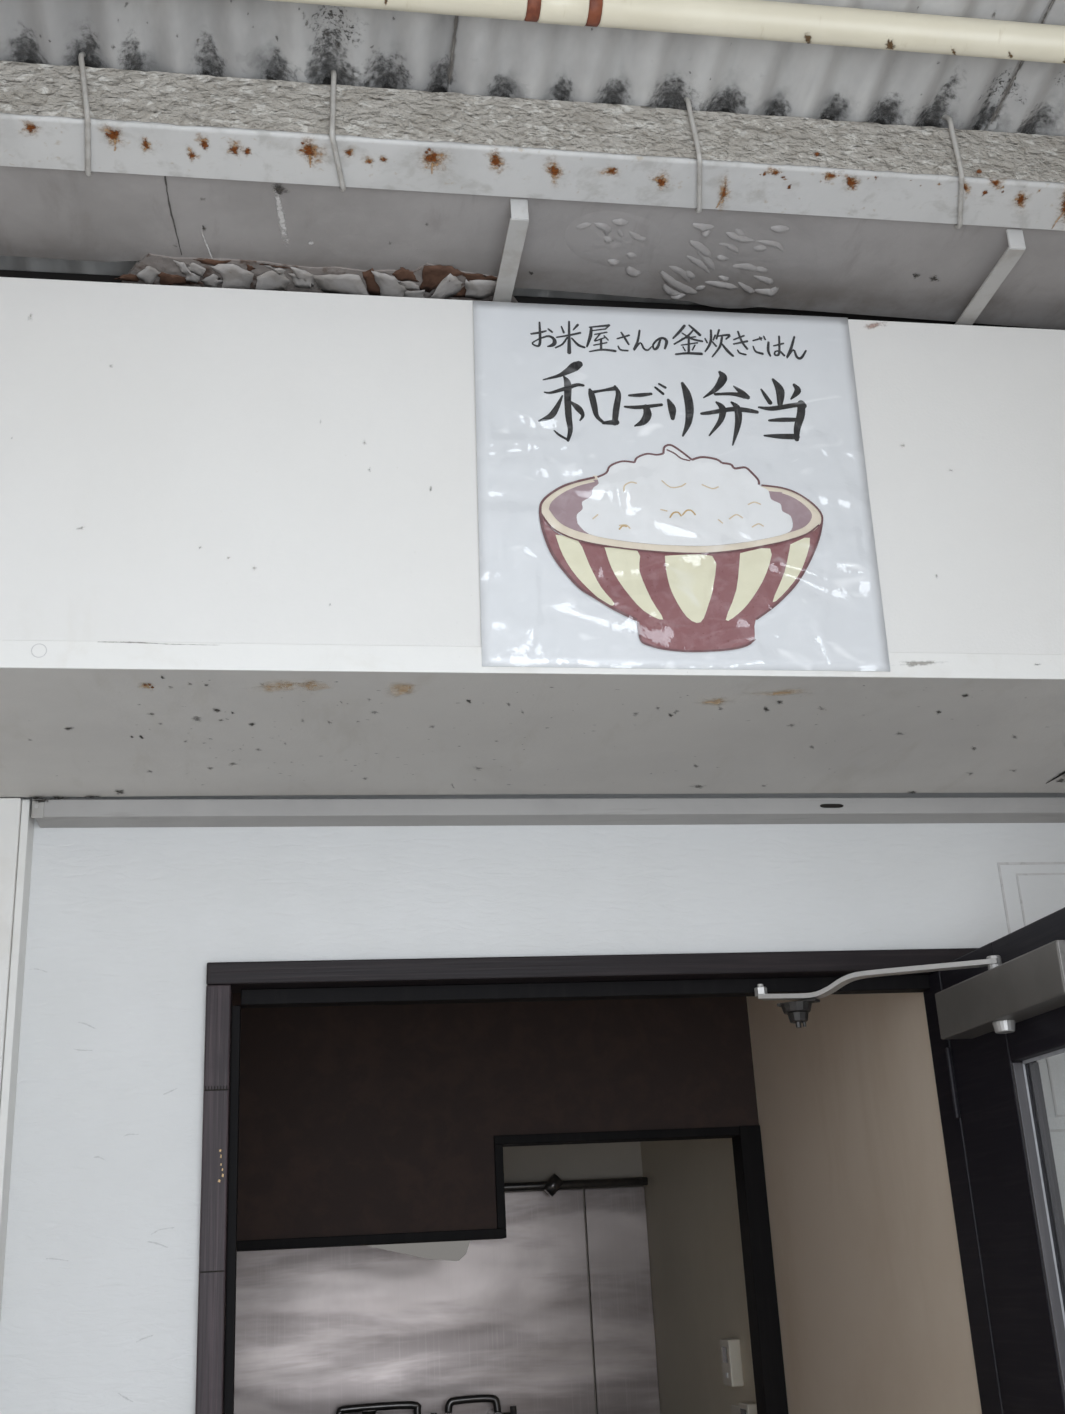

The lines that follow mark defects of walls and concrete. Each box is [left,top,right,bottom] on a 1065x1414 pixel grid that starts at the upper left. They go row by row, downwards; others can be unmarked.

corrosion [524,0,541,22]
corrosion [585,0,603,27]
leakage [75,35,144,71]
leakage [299,6,408,89]
peeling [0,61,1065,183]
leakage [648,72,745,113]
leakage [916,79,955,128]
leakage [972,52,1047,134]
corrosion [299,141,323,167]
corrosion [820,172,857,190]
corrosion [964,169,1040,207]
peeling [113,253,498,301]